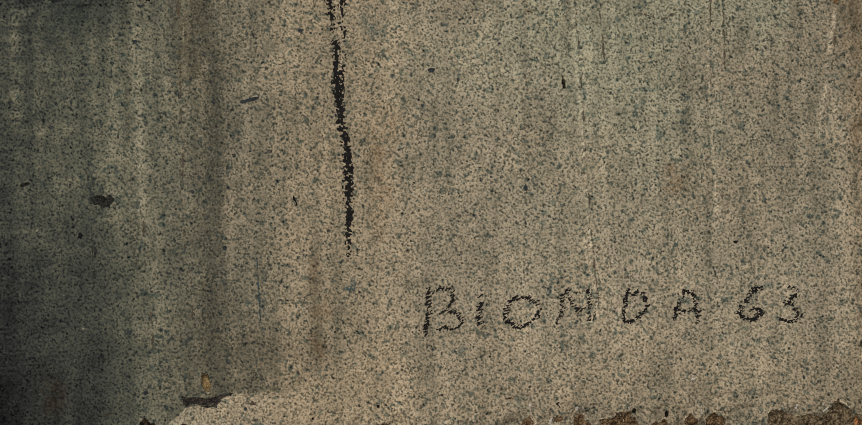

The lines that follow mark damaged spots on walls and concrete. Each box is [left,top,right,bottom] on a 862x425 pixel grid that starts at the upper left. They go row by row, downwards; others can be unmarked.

crack [598,13,606,63]
peeling [180,372,286,425]
spalling [554,407,638,425]
spalling [684,410,725,425]
spalling [767,397,862,425]